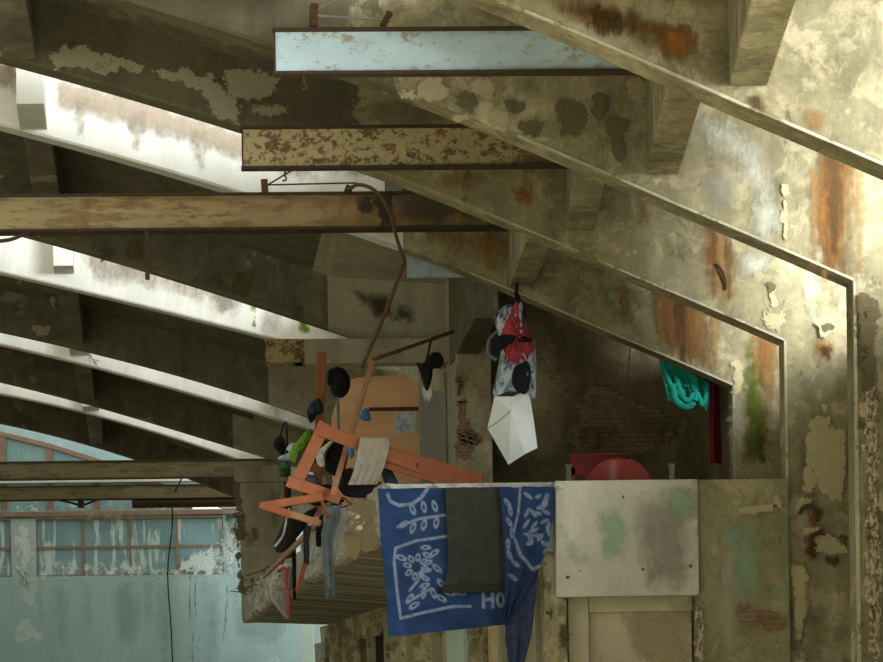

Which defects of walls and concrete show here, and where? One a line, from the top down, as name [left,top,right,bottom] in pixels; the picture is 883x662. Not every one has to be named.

rust [561,4,696,56]
water stain [0,64,16,85]
water stain [59,81,242,156]
peeling [47,44,289,126]
rust [810,154,862,273]
rust [707,229,731,300]
rust [653,292,719,365]
water stain [730,346,765,459]
rust [753,335,778,399]
spalling [857,292,883,662]
peeling [12,479,259,595]
flaking render [734,403,849,662]